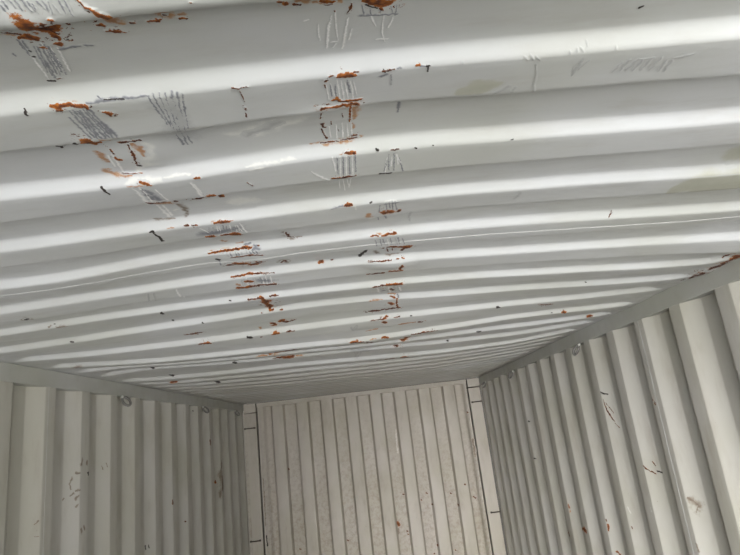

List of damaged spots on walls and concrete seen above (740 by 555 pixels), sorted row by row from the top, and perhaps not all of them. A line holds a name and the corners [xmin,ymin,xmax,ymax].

rust [0,0,197,60]
rust [258,0,416,22]
rust [41,92,128,120]
rust [304,58,432,157]
rust [45,126,160,189]
rust [184,190,232,204]
rust [165,211,304,339]
rust [329,196,441,362]
rust [672,252,740,282]
rust [254,343,305,361]